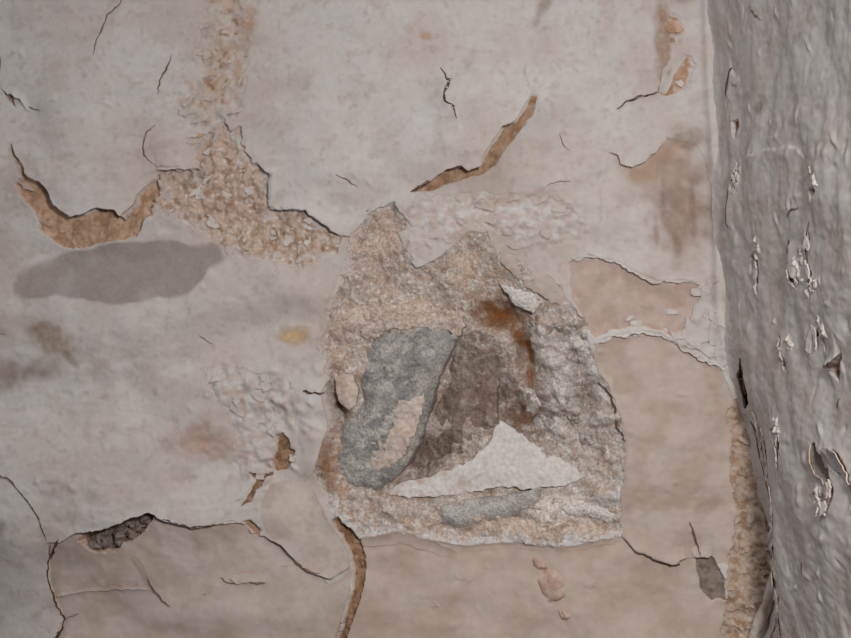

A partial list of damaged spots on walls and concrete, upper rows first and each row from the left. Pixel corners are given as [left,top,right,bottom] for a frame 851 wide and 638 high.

crack [93,0,122,55]
flaking render [12,0,344,270]
crack [440,67,457,118]
peeling [601,134,715,267]
corrosion [485,305,534,379]
crack [0,475,77,638]
peeling [50,513,299,638]
crack [163,519,215,529]
flaking render [274,433,297,471]
crack [335,517,366,638]
spalling [314,196,777,638]
peeling [809,444,850,517]